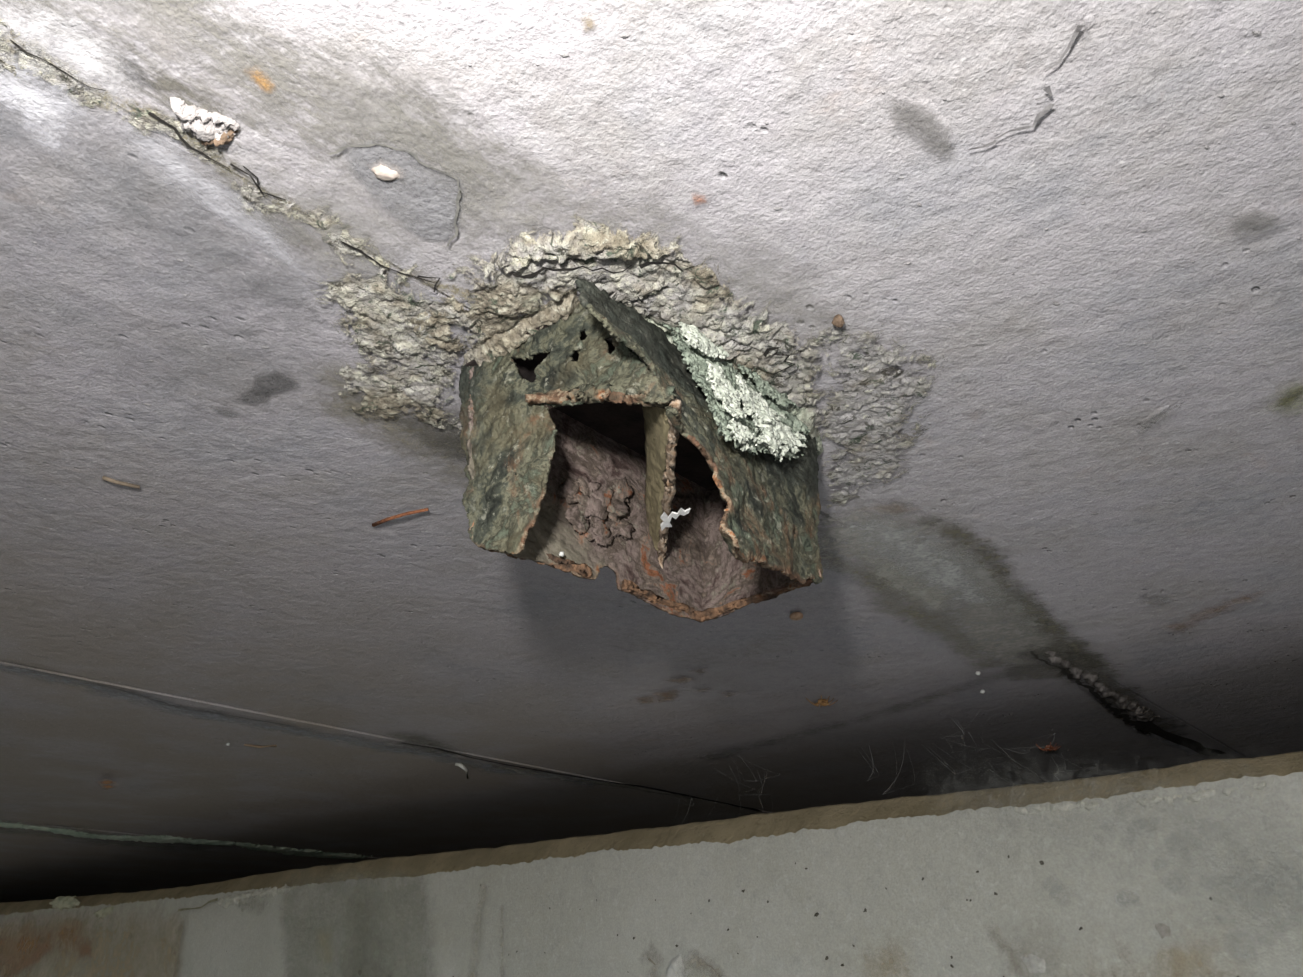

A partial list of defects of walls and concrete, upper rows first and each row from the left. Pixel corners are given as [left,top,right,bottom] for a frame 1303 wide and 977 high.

damp [0,62,75,147]
damp [0,3,223,125]
crack [0,18,468,297]
damp [138,136,370,265]
damp [135,0,541,224]
peeling [328,143,462,246]
damp [333,383,466,473]
spalling [306,214,944,522]
peeling [660,508,690,530]
damp [819,505,1107,680]